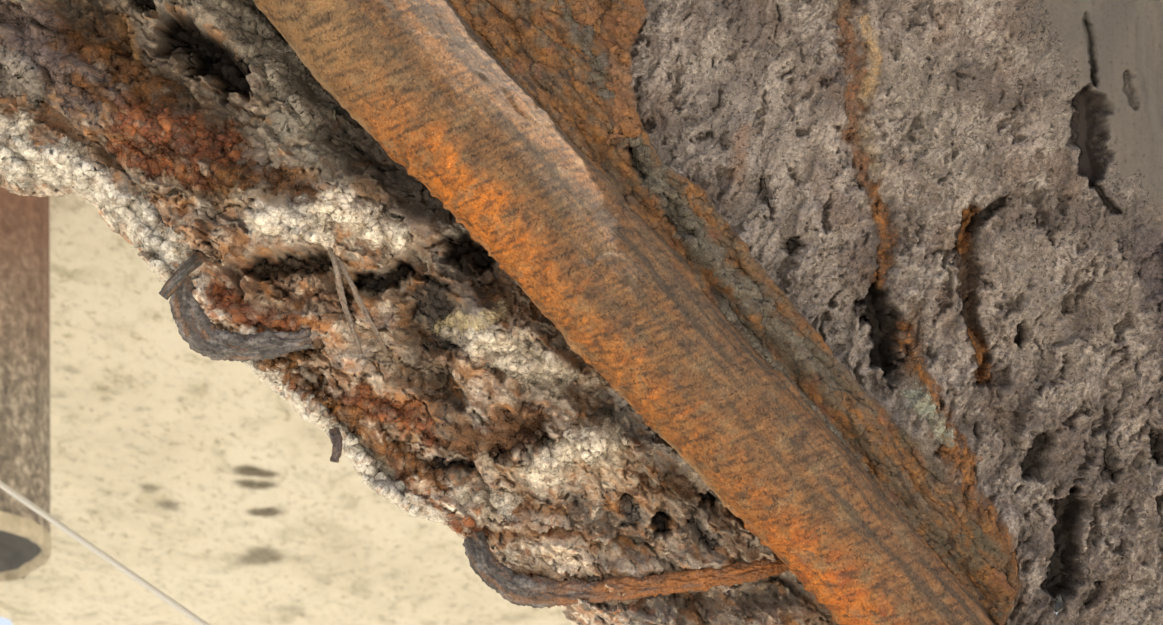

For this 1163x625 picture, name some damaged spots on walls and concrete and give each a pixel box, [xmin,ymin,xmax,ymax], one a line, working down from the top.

rust [0,0,353,215]
crack [1069,14,1137,213]
rust [210,281,300,333]
spalling [0,0,840,625]
rust [449,0,1021,625]
spalling [629,0,1163,625]
crack [953,197,1006,384]
rust [253,339,548,539]